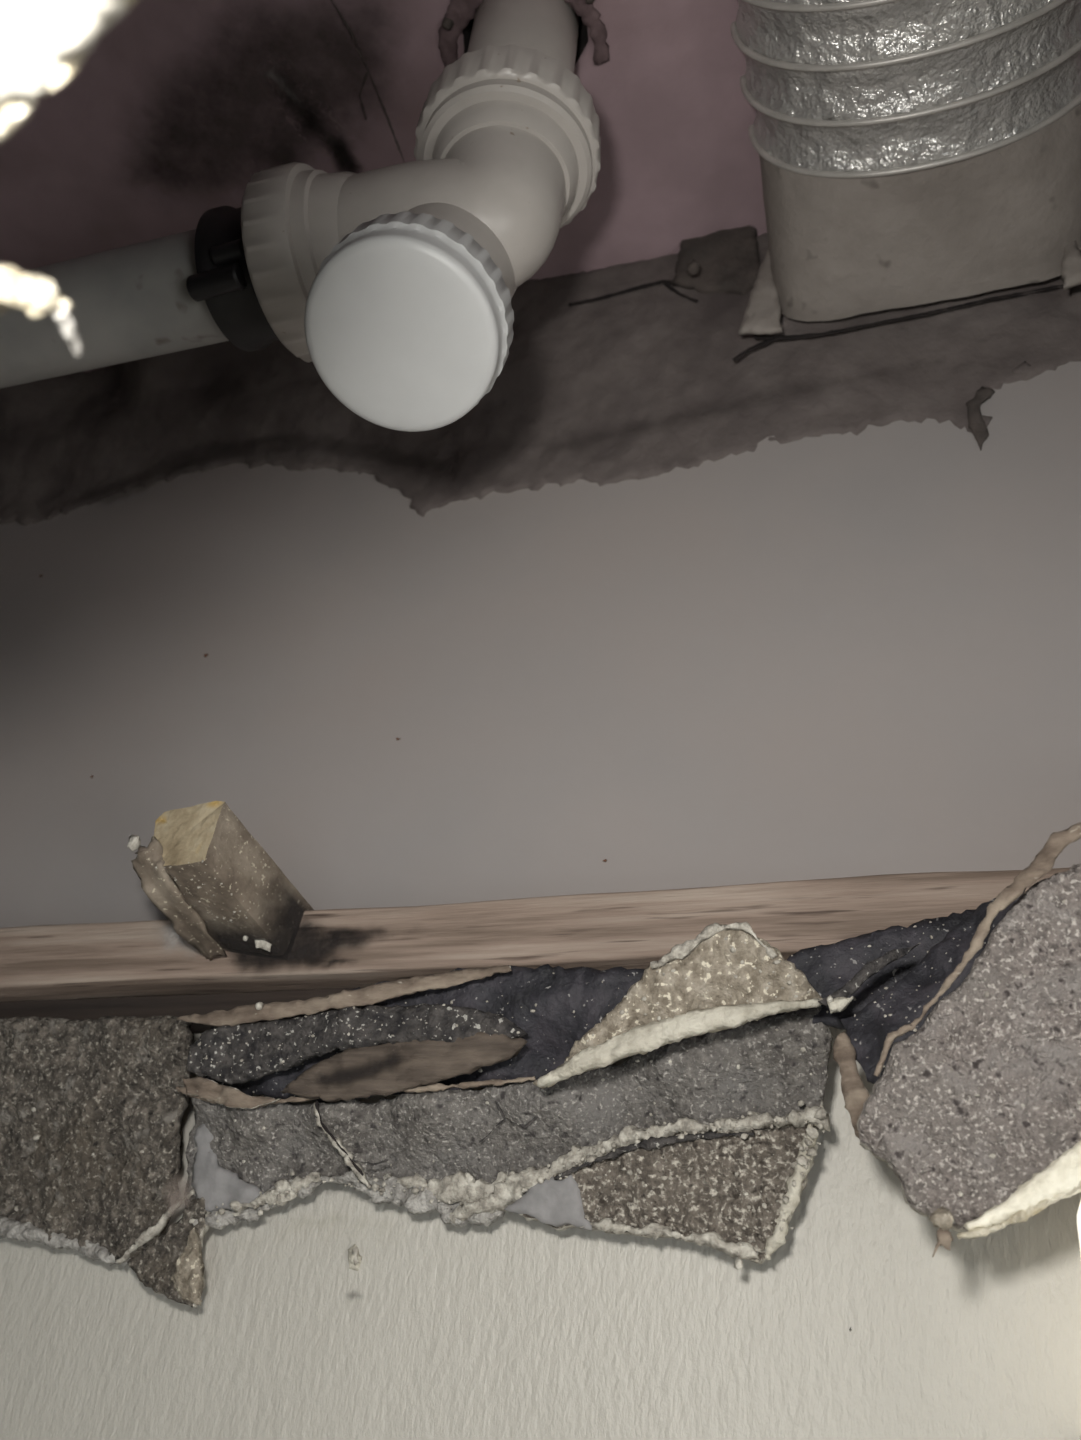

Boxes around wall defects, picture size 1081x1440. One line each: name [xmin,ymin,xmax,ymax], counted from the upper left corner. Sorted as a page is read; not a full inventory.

spalling [438,0,484,67]
spalling [564,0,610,65]
spalling [0,61,76,141]
spalling [0,263,83,360]
peeling [533,922,854,1089]
spalling [0,1100,831,1308]
spalling [964,1140,1081,1231]